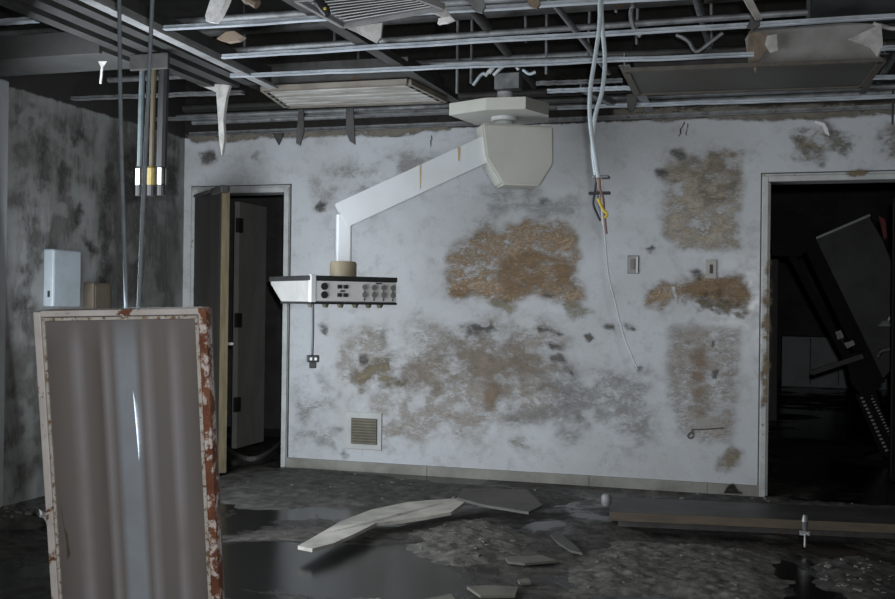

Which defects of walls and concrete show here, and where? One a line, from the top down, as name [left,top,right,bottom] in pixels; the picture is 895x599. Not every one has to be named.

flaking render [188,124,451,143]
flaking render [613,103,895,135]
damp [4,114,179,451]
damp [339,324,648,439]